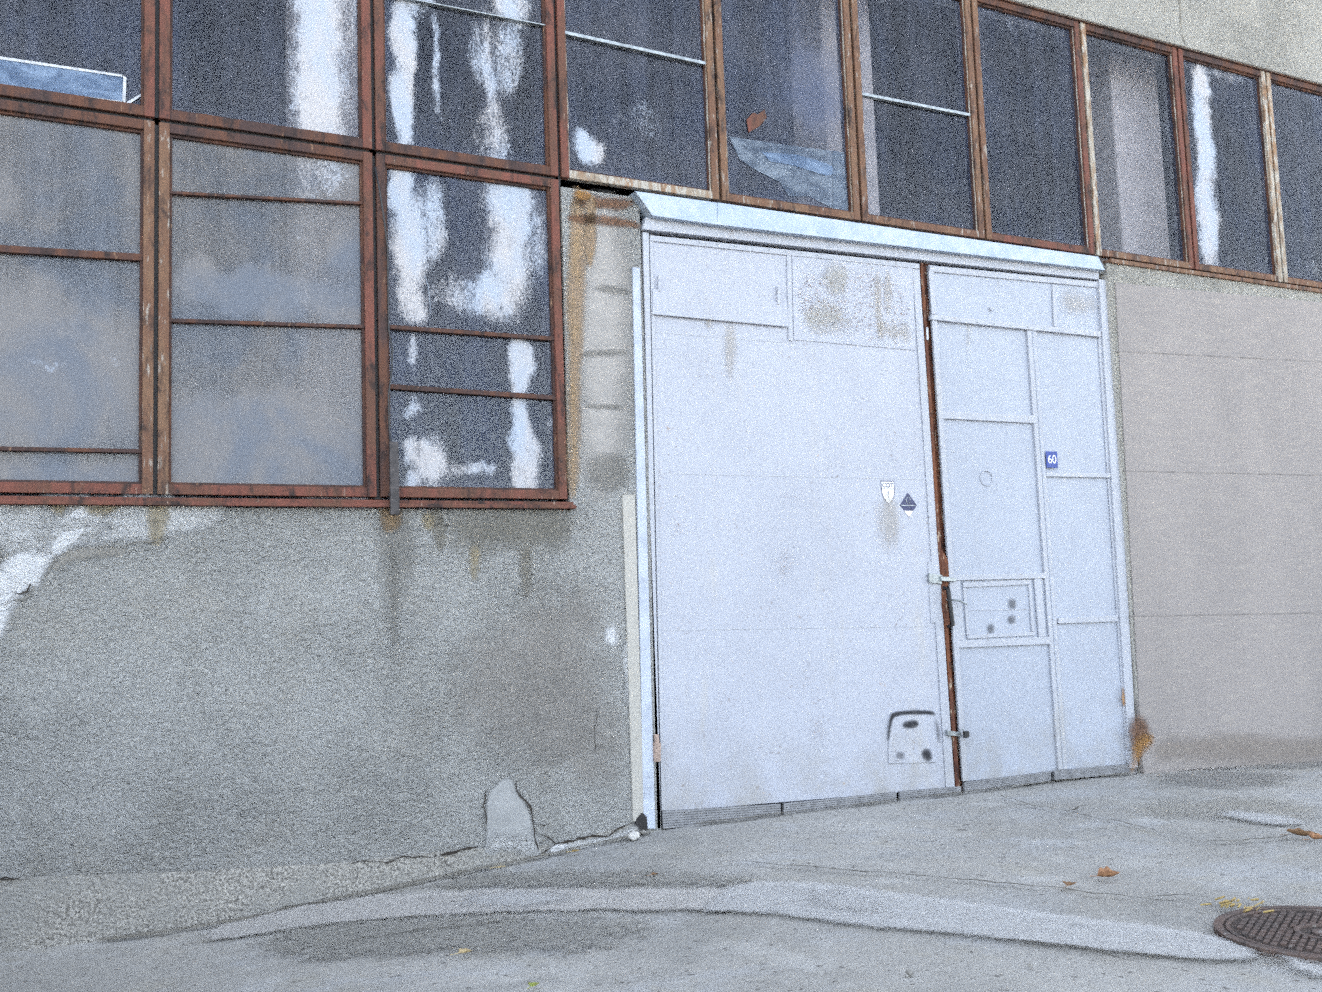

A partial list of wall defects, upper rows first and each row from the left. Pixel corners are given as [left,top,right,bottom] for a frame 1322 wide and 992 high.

rust [567,190,639,496]
flaking render [0,496,227,638]
rust [1130,718,1152,766]
crack [264,779,635,911]